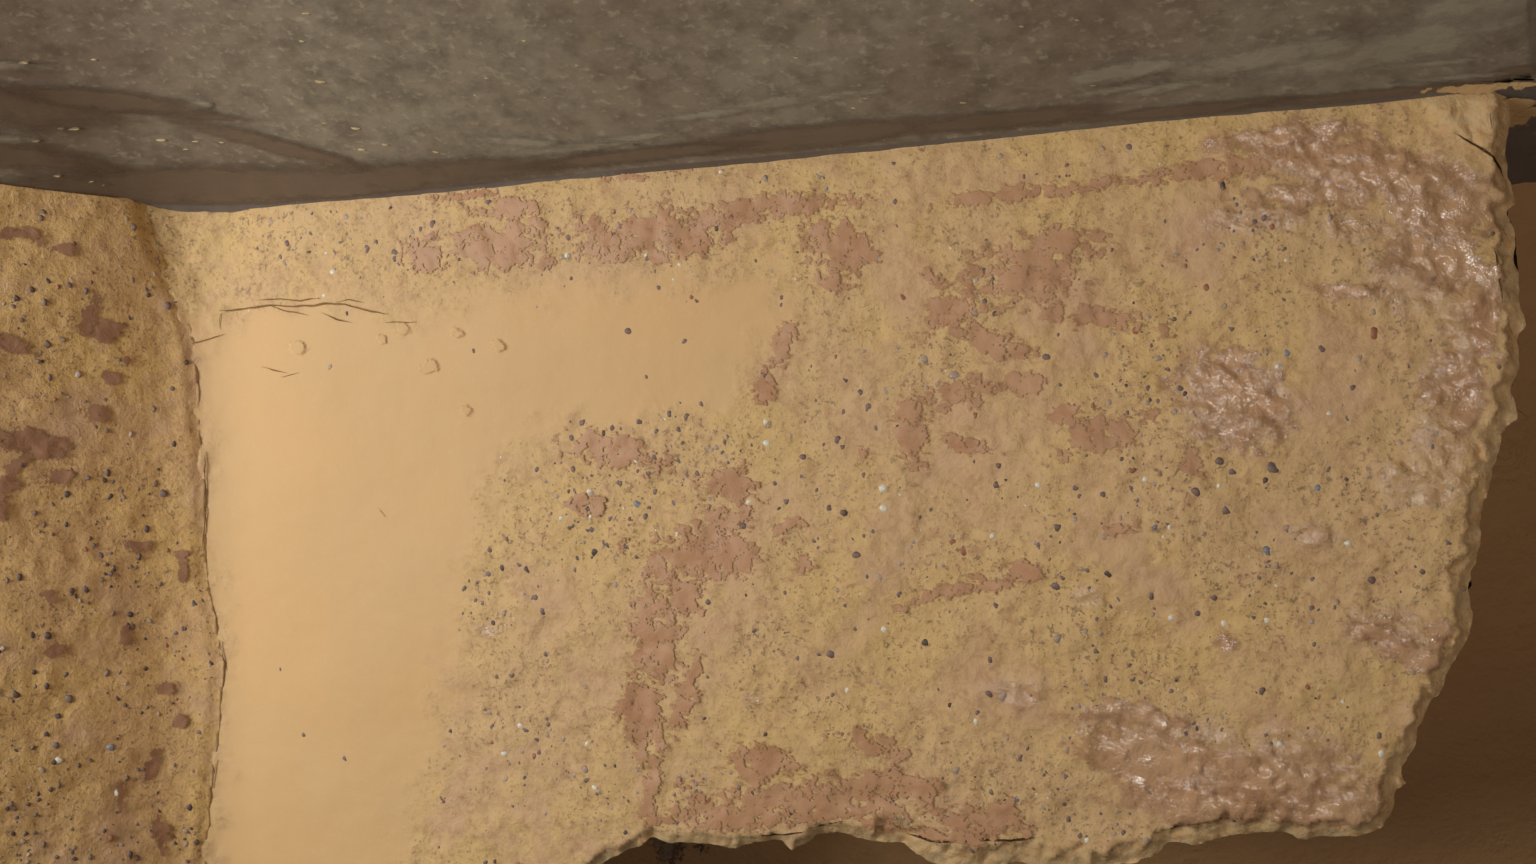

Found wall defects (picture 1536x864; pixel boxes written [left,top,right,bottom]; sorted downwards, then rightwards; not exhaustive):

spalling [268,209,436,275]
spalling [530,196,633,287]
spalling [1183,181,1293,266]
spalling [957,267,1015,324]
spalling [1093,299,1211,540]
spalling [458,401,806,631]
spalling [1028,533,1098,591]
spalling [1244,525,1315,610]
spalling [1031,593,1227,851]
spalling [1241,684,1349,765]
spalling [430,705,761,864]